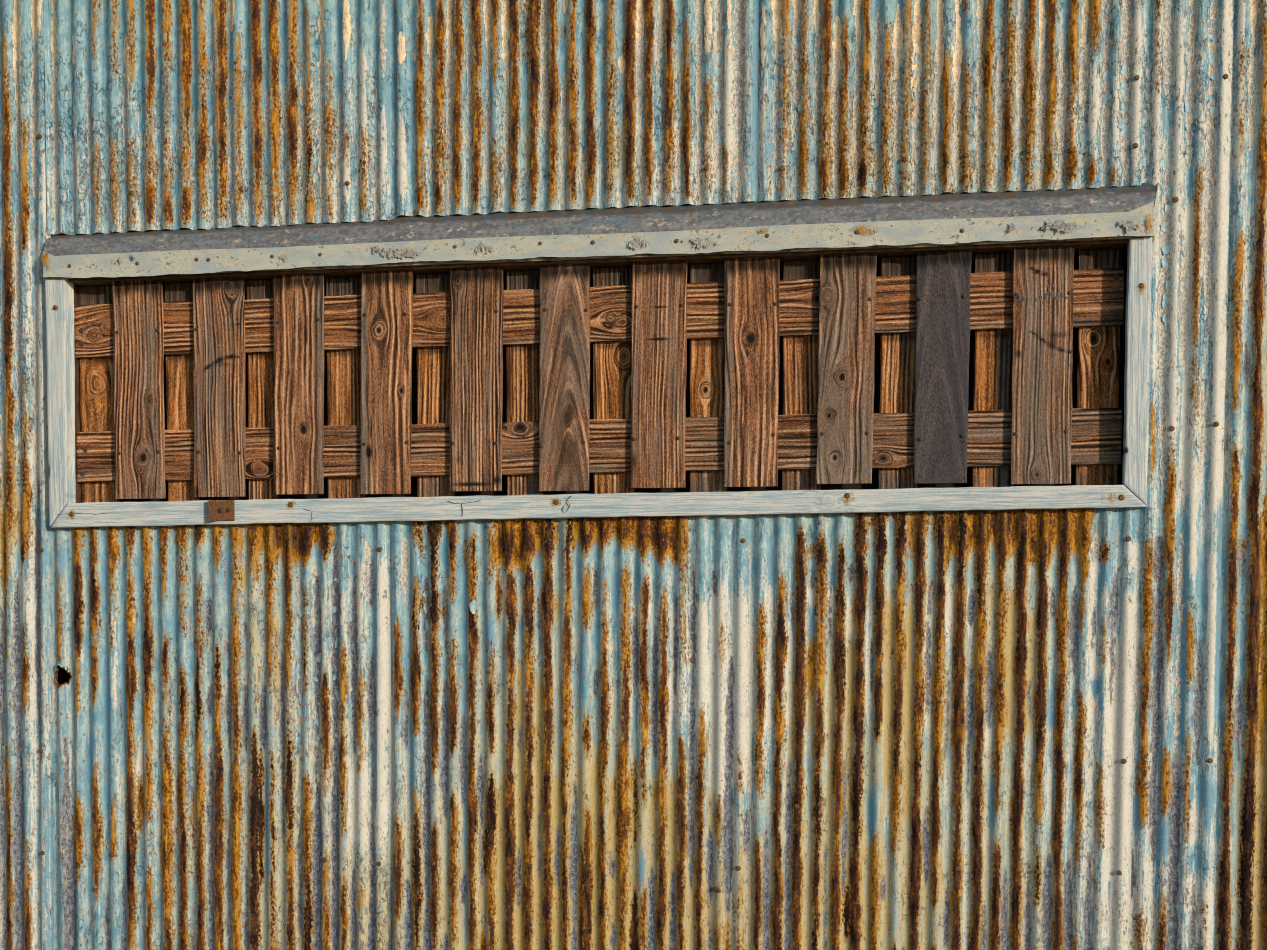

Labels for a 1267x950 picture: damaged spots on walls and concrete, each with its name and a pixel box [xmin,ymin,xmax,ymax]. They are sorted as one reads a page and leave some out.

corrosion [91,0,374,231]
corrosion [412,0,734,214]
corrosion [777,0,1121,199]
corrosion [1148,0,1166,97]
corrosion [0,31,35,713]
corrosion [1136,164,1203,848]
corrosion [1197,0,1267,950]
corrosion [56,493,1110,950]
corrosion [3,741,36,950]
corrosion [1130,885,1168,950]